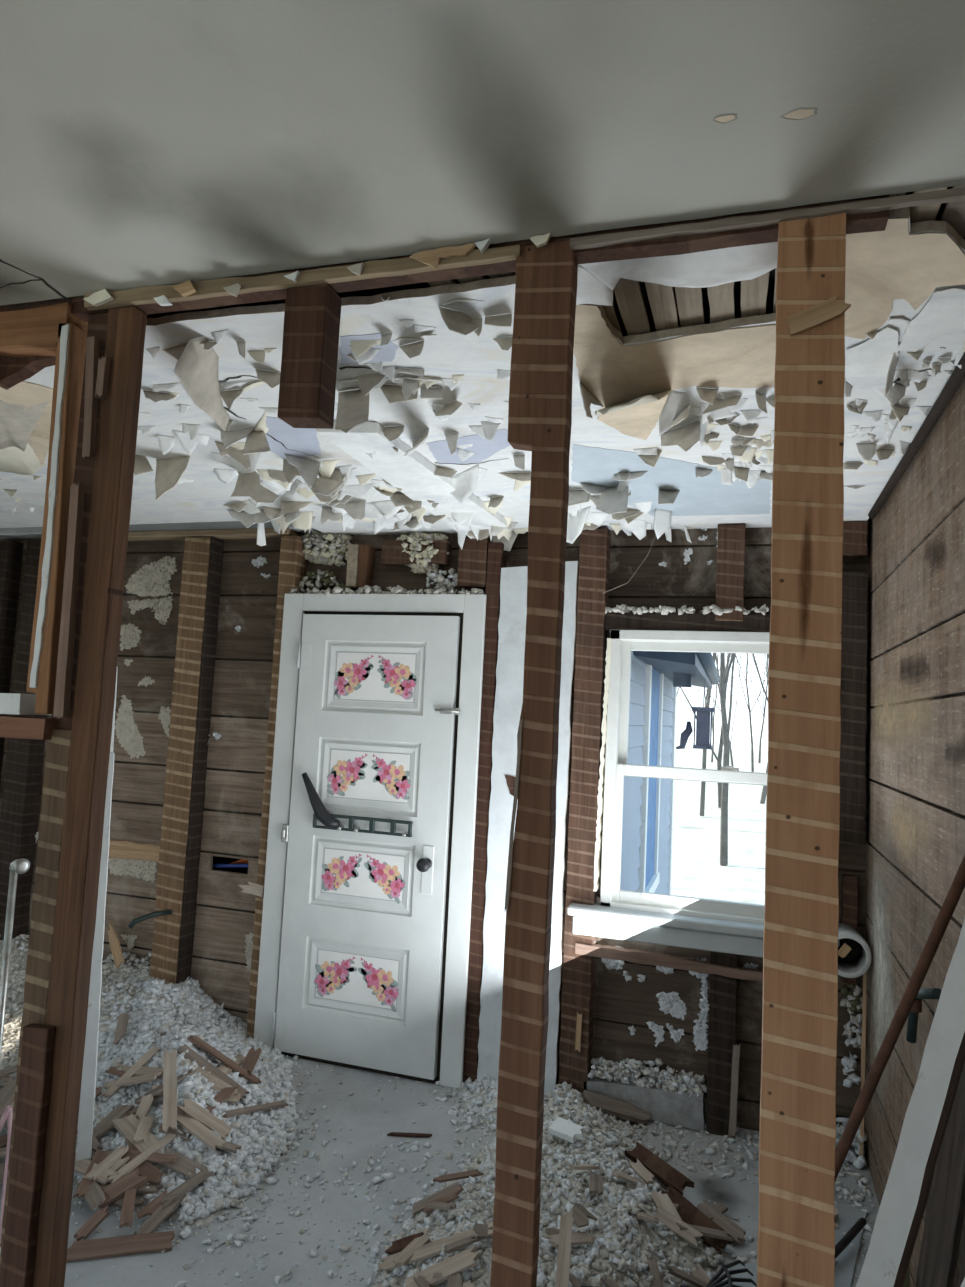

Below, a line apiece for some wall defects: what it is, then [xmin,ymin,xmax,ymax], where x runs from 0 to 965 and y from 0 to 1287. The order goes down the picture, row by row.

crack [0,259,72,308]
peeling [83,289,114,307]
peeling [530,232,552,248]
peeling [843,185,965,470]
peeling [0,381,53,513]
peeling [134,238,531,579]
peeling [566,242,778,564]
peeling [120,556,178,666]
peeling [114,676,155,759]
peeling [158,706,171,737]